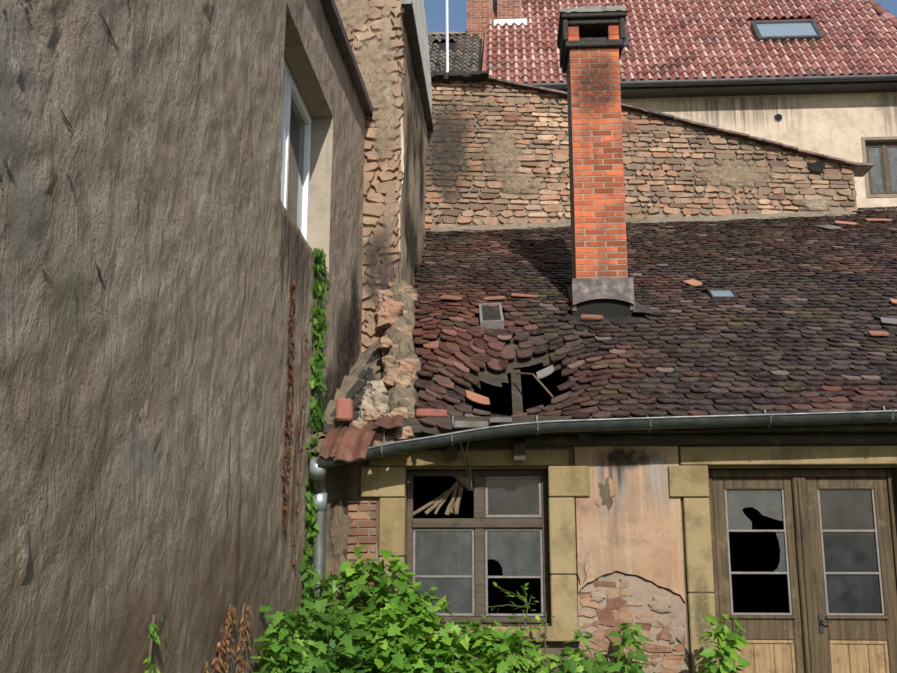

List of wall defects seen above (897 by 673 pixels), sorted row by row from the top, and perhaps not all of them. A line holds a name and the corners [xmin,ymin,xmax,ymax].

damp [598,450,666,518]
flaking render [577,571,689,673]